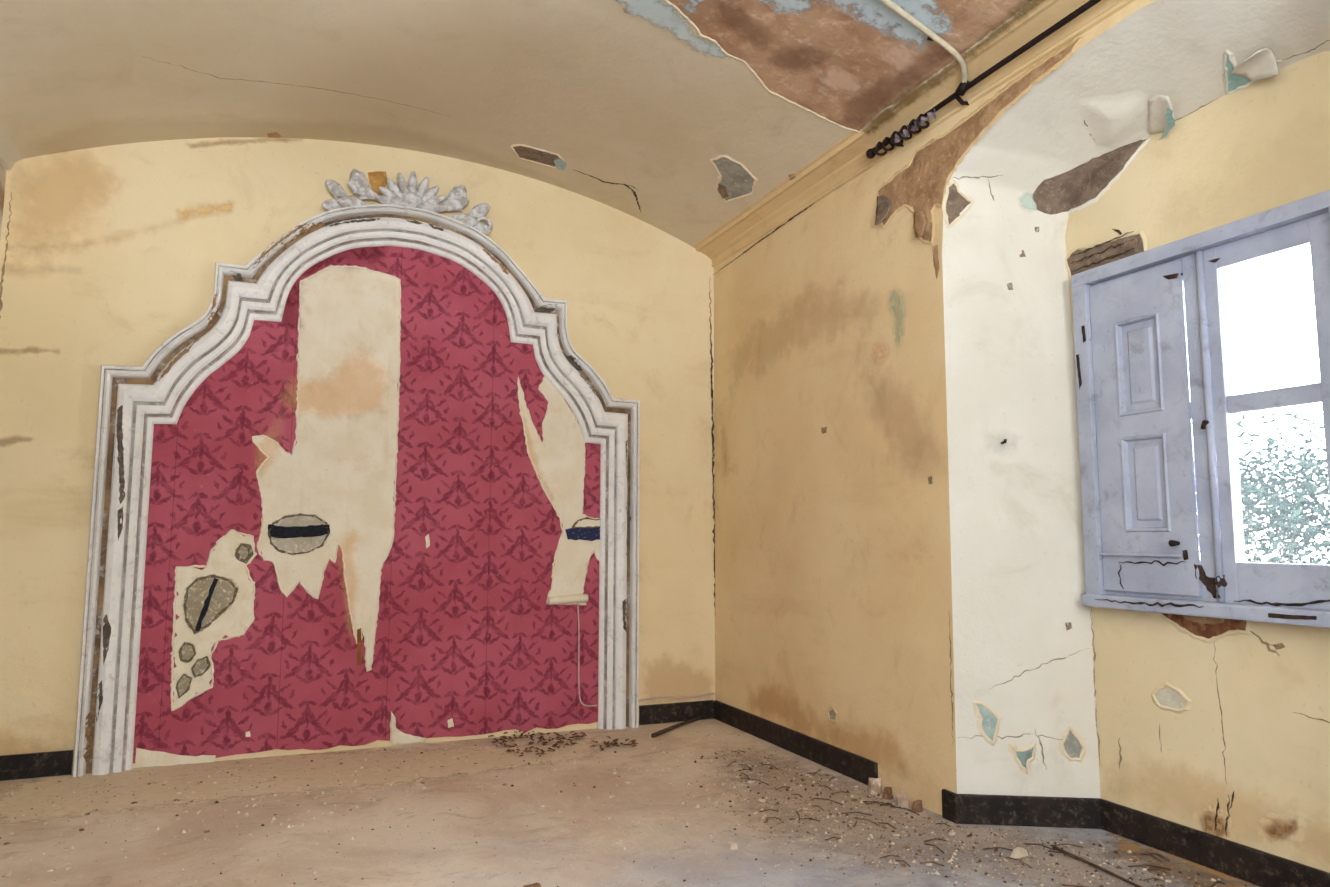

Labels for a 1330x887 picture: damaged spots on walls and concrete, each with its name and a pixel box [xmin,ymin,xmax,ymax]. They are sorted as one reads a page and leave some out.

spalling [615,0,1032,133]
spalling [511,144,568,170]
spalling [710,155,758,202]
spalling [875,37,1084,279]
spalling [1033,40,1330,232]
peeling [1182,550,1227,599]
spalling [1158,613,1253,644]
spalling [973,701,1037,775]
spalling [1059,727,1087,763]